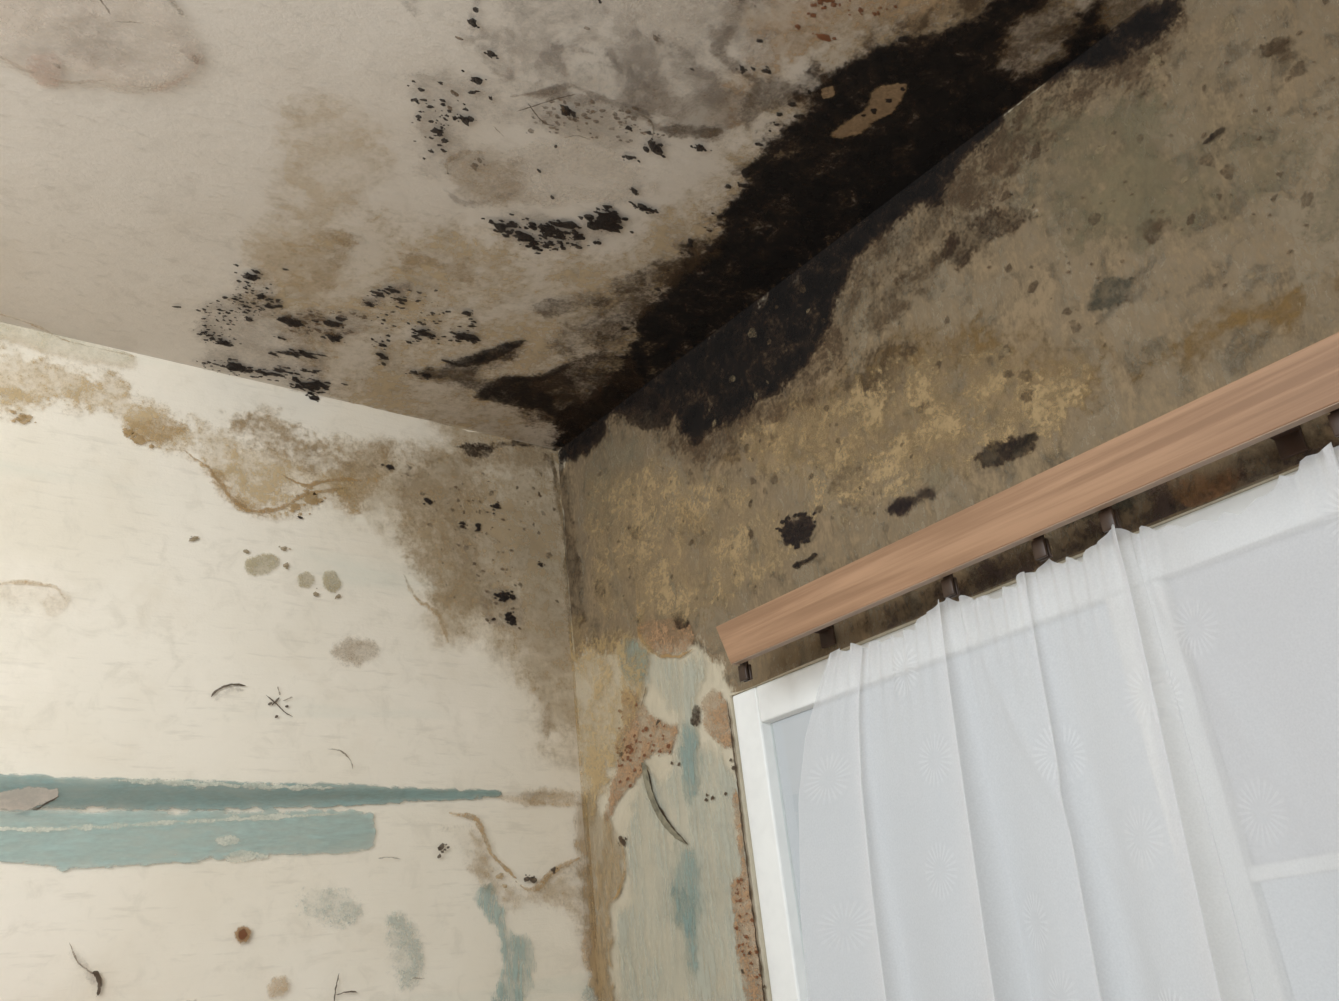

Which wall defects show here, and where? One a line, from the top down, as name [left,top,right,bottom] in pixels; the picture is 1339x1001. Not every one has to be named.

water stain [411,85,641,205]
water stain [611,83,736,158]
water stain [481,205,634,263]
water stain [197,348,331,402]
water stain [199,444,383,519]
water stain [1112,412,1339,533]
water stain [243,546,341,599]
water stain [951,511,1107,601]
flaking render [637,618,694,658]
peeling [0,787,59,812]
flaking render [604,688,766,1001]
peeling [69,942,103,997]